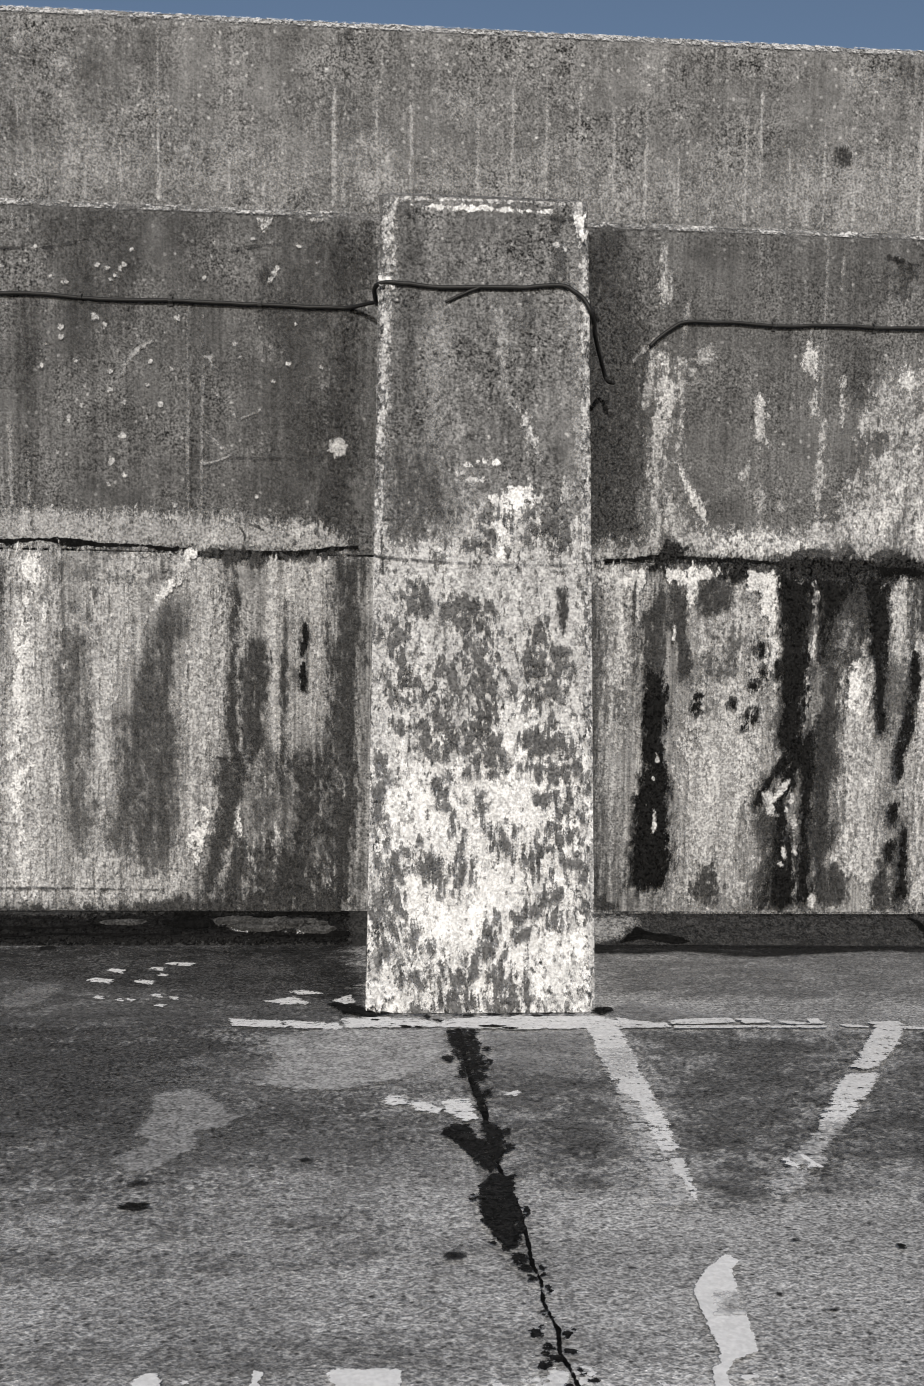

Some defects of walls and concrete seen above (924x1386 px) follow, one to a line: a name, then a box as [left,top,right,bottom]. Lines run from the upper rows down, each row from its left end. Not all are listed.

damp [20,60,293,209]
damp [328,55,924,377]
damp [0,220,647,1224]
damp [573,230,924,1013]
damp [137,1338,338,1374]
crack [371,1011,601,1386]
damp [622,1021,924,1215]